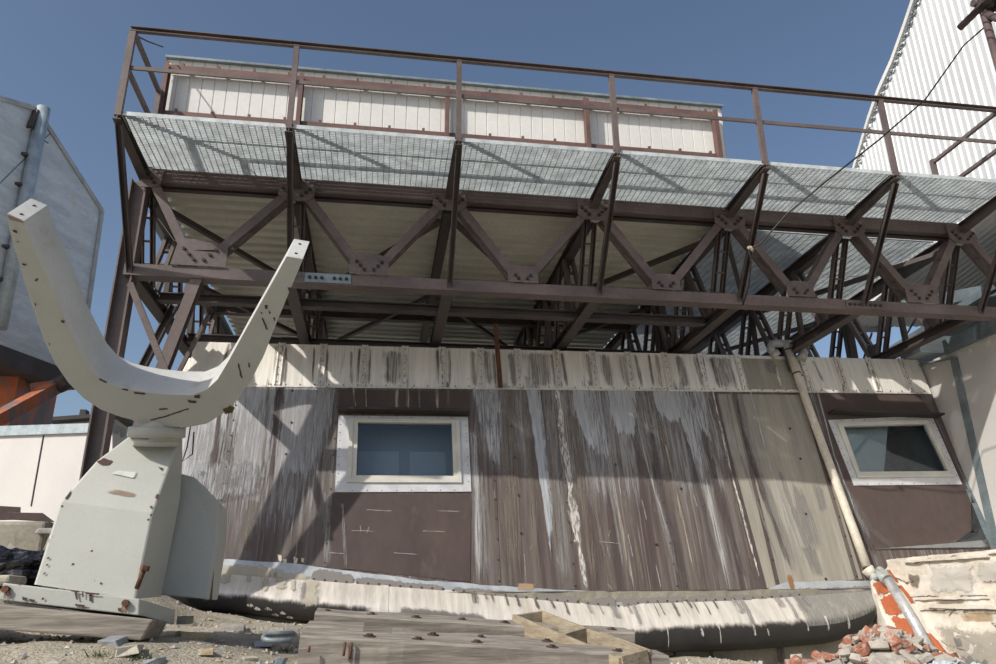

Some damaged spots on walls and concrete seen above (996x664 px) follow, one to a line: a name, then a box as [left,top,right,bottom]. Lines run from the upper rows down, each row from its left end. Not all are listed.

water stain [210,413,231,476]
water stain [262,347,287,474]
water stain [387,351,409,407]
water stain [471,433,490,571]
water stain [500,353,612,581]
water stain [586,354,700,585]
water stain [676,357,815,577]
water stain [220,564,318,607]
water stain [587,604,641,624]
water stain [732,600,770,635]
water stain [775,590,876,631]
crack [896,555,996,624]